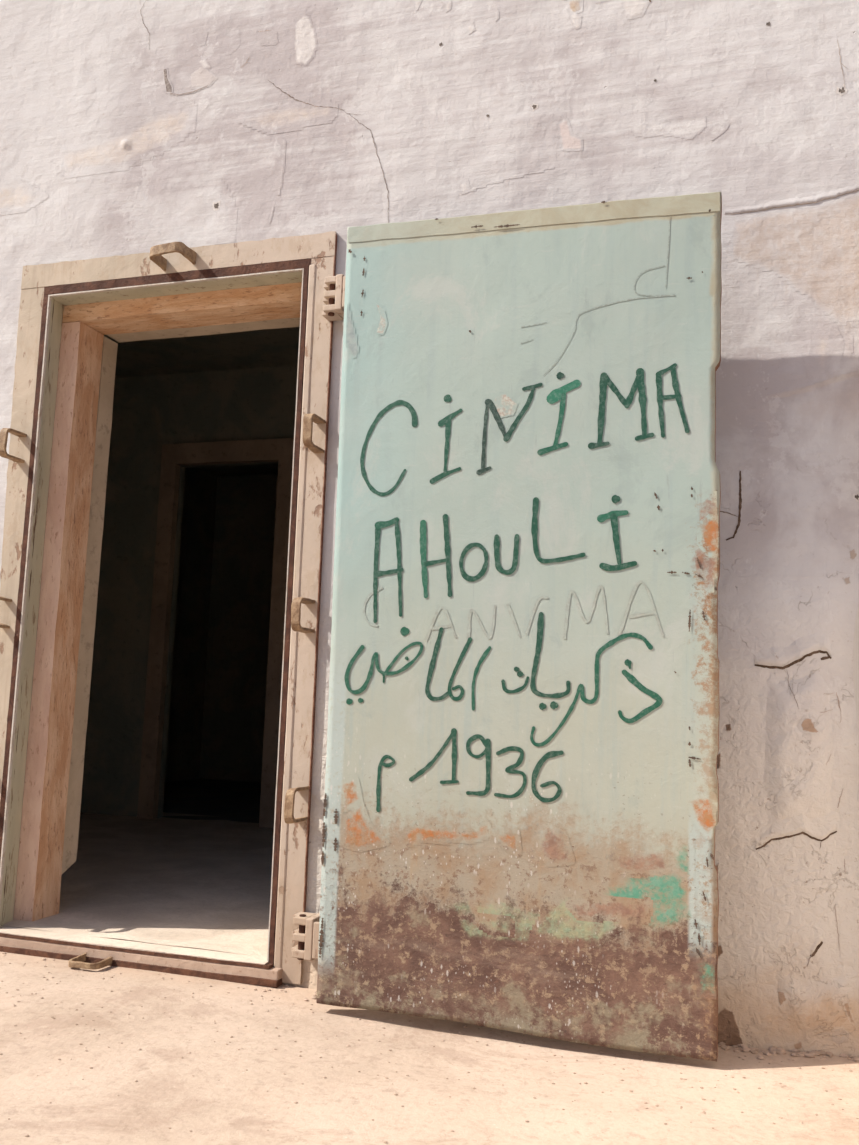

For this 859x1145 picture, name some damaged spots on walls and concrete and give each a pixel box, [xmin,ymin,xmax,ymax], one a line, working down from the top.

flaking render [293,14,317,66]
crack [269,81,389,223]
crack [755,632,841,722]
crack [755,789,846,873]
crack [807,909,840,966]